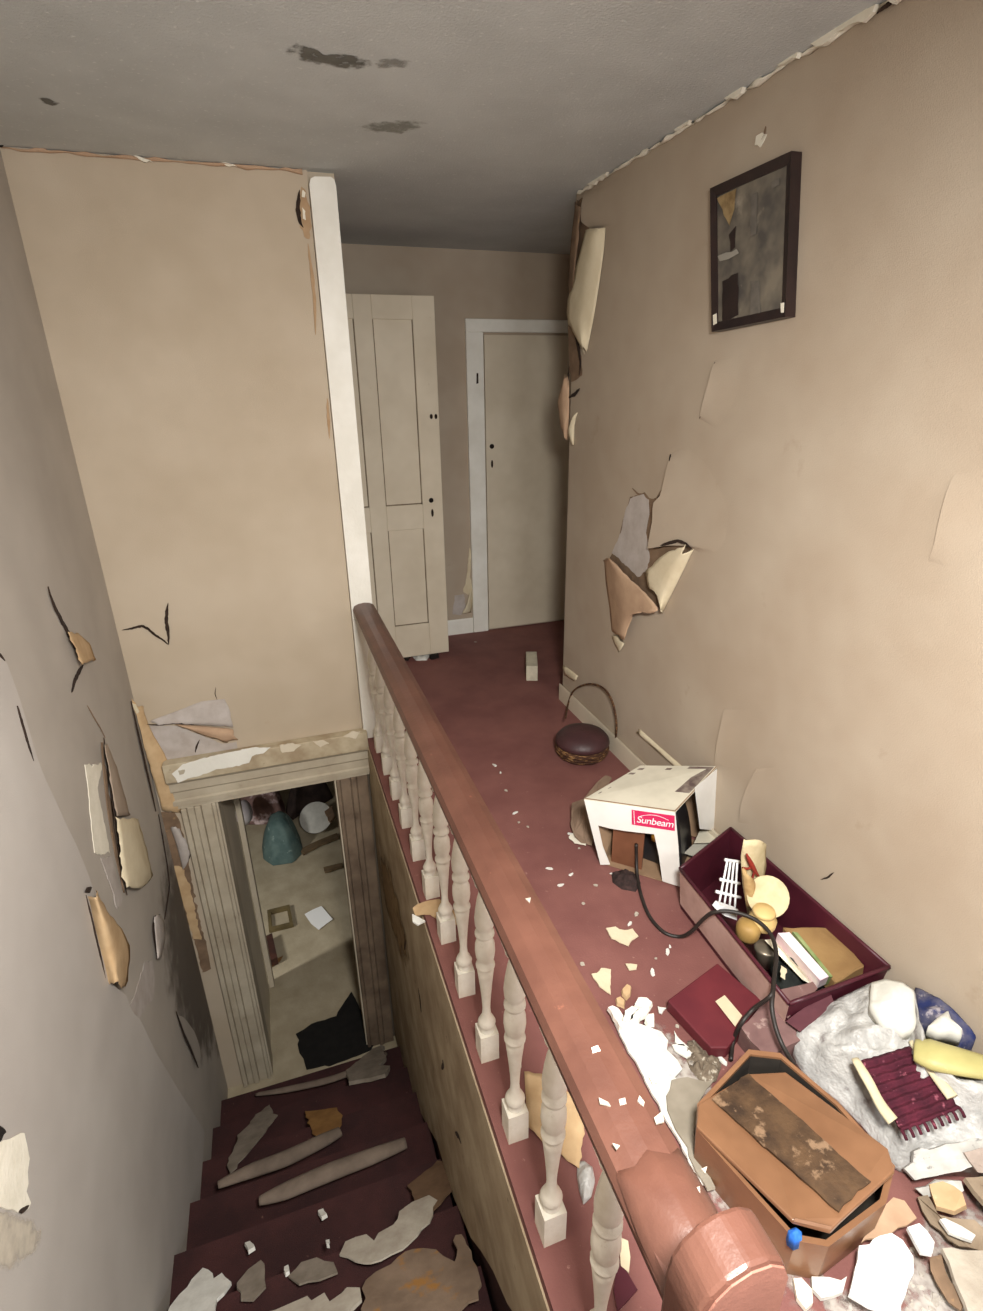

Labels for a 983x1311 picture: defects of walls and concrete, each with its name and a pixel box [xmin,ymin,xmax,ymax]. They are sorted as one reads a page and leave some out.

leakage [289,47,404,69]
flaking render [577,0,902,194]
peeling [612,494,650,577]
crack [32,586,96,693]
crack [122,601,170,645]
peeling [84,706,153,909]
peeling [131,698,329,813]
peeling [0,1126,37,1267]